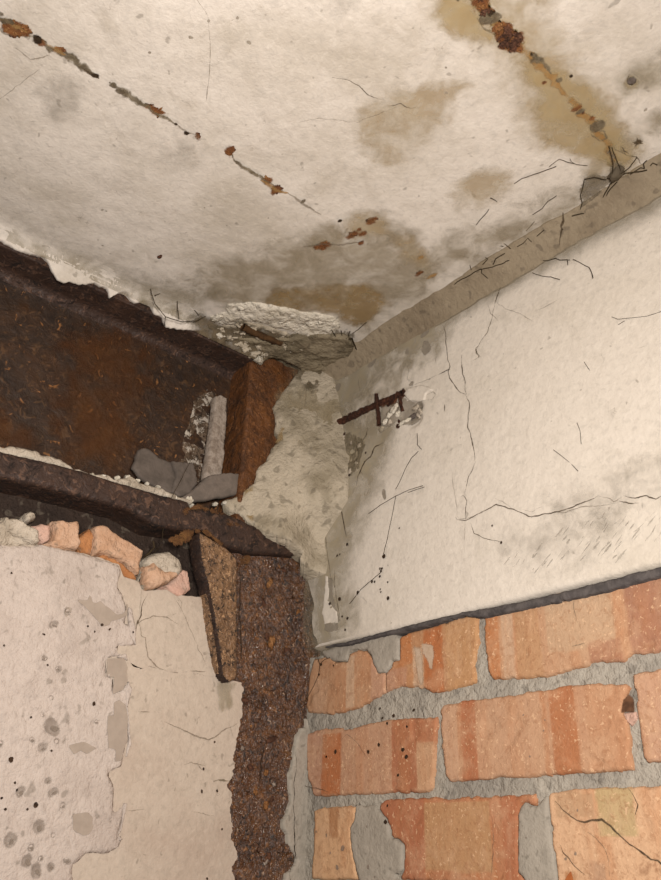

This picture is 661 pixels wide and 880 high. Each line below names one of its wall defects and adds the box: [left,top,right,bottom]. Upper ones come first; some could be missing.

leakage [525,57,632,163]
rust [263,175,284,195]
rust [346,217,378,245]
leakage [268,285,384,325]
crack [427,289,661,542]
peeling [0,512,190,880]
crack [555,801,661,864]